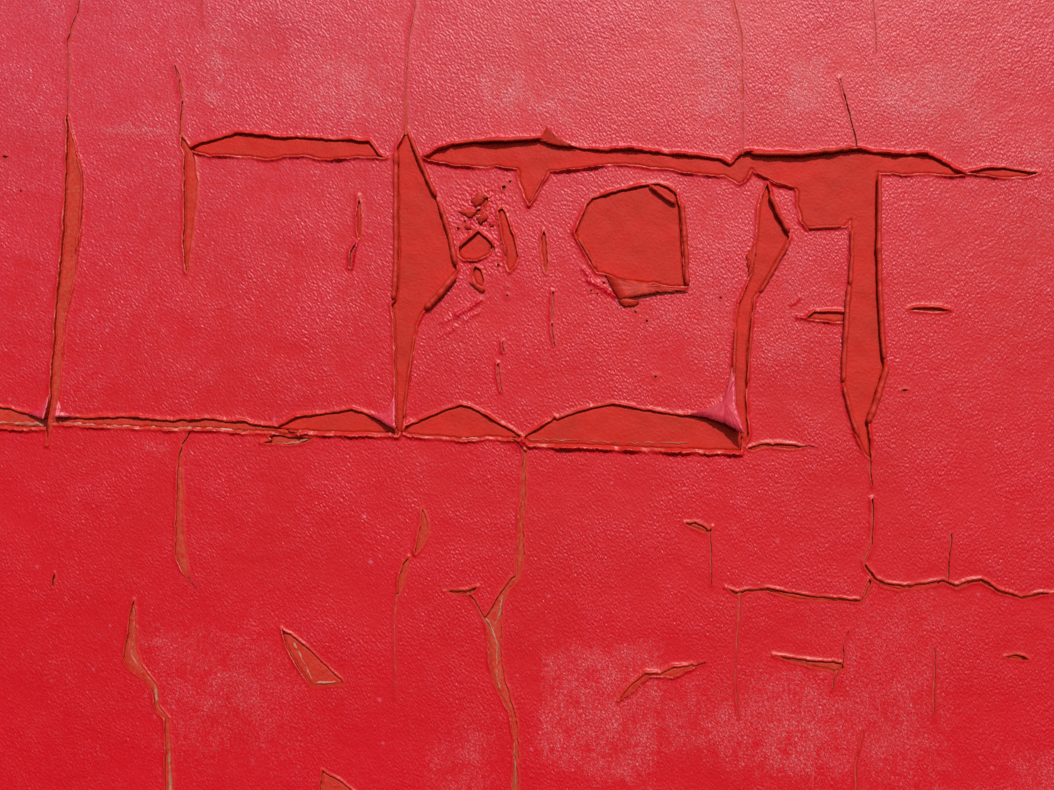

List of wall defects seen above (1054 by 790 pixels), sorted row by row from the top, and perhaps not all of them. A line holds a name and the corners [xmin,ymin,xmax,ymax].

peeling [27,0,91,454]
peeling [171,0,1046,462]
crack [117,594,179,790]
crack [0,398,302,593]
peeling [275,622,350,693]
peeling [313,763,364,790]
crack [389,502,434,702]
crack [440,437,533,790]
crack [744,434,821,460]
crack [612,458,1054,724]